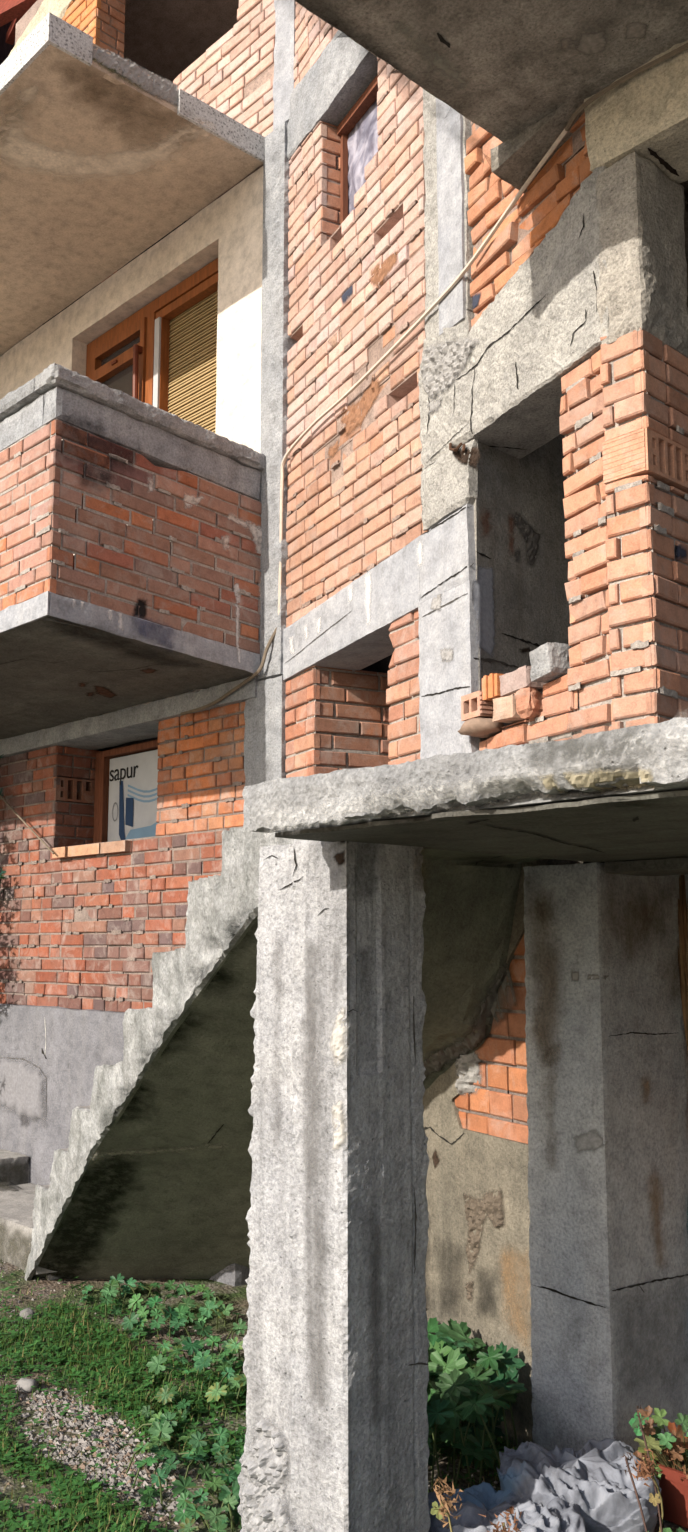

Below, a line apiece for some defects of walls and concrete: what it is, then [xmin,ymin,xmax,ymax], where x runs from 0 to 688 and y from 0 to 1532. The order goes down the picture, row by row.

crack [570,270,597,346]
crack [427,296,545,460]
spalling [449,443,480,466]
spalling [271,762,665,825]
leakage [212,920,244,945]
leakage [196,963,231,990]
leakage [110,1085,148,1122]
leakage [0,1145,223,1279]
crack [534,1274,688,1308]